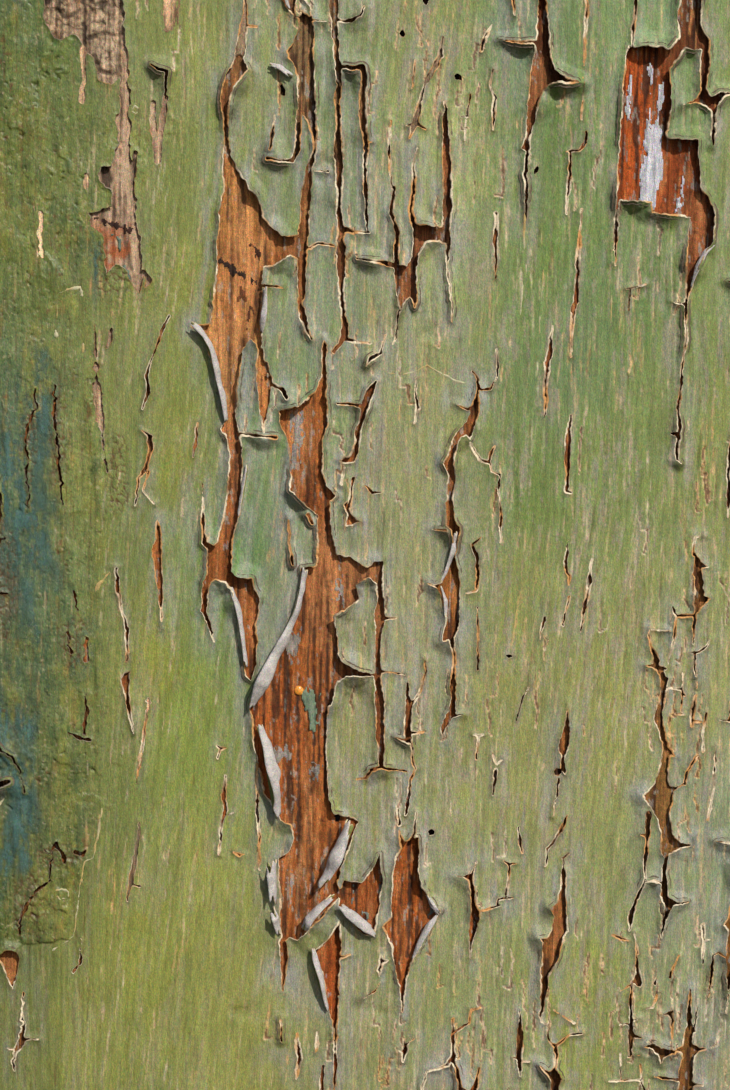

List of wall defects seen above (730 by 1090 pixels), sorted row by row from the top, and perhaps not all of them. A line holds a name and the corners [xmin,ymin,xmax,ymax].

peeling [161,0,193,32]
peeling [43,0,169,293]
peeling [610,0,719,467]
crack [0,385,64,543]
crack [66,590,90,663]
peeling [191,0,457,1090]
peeling [389,364,483,739]
crack [0,742,26,794]
peeling [721,906,730,1014]